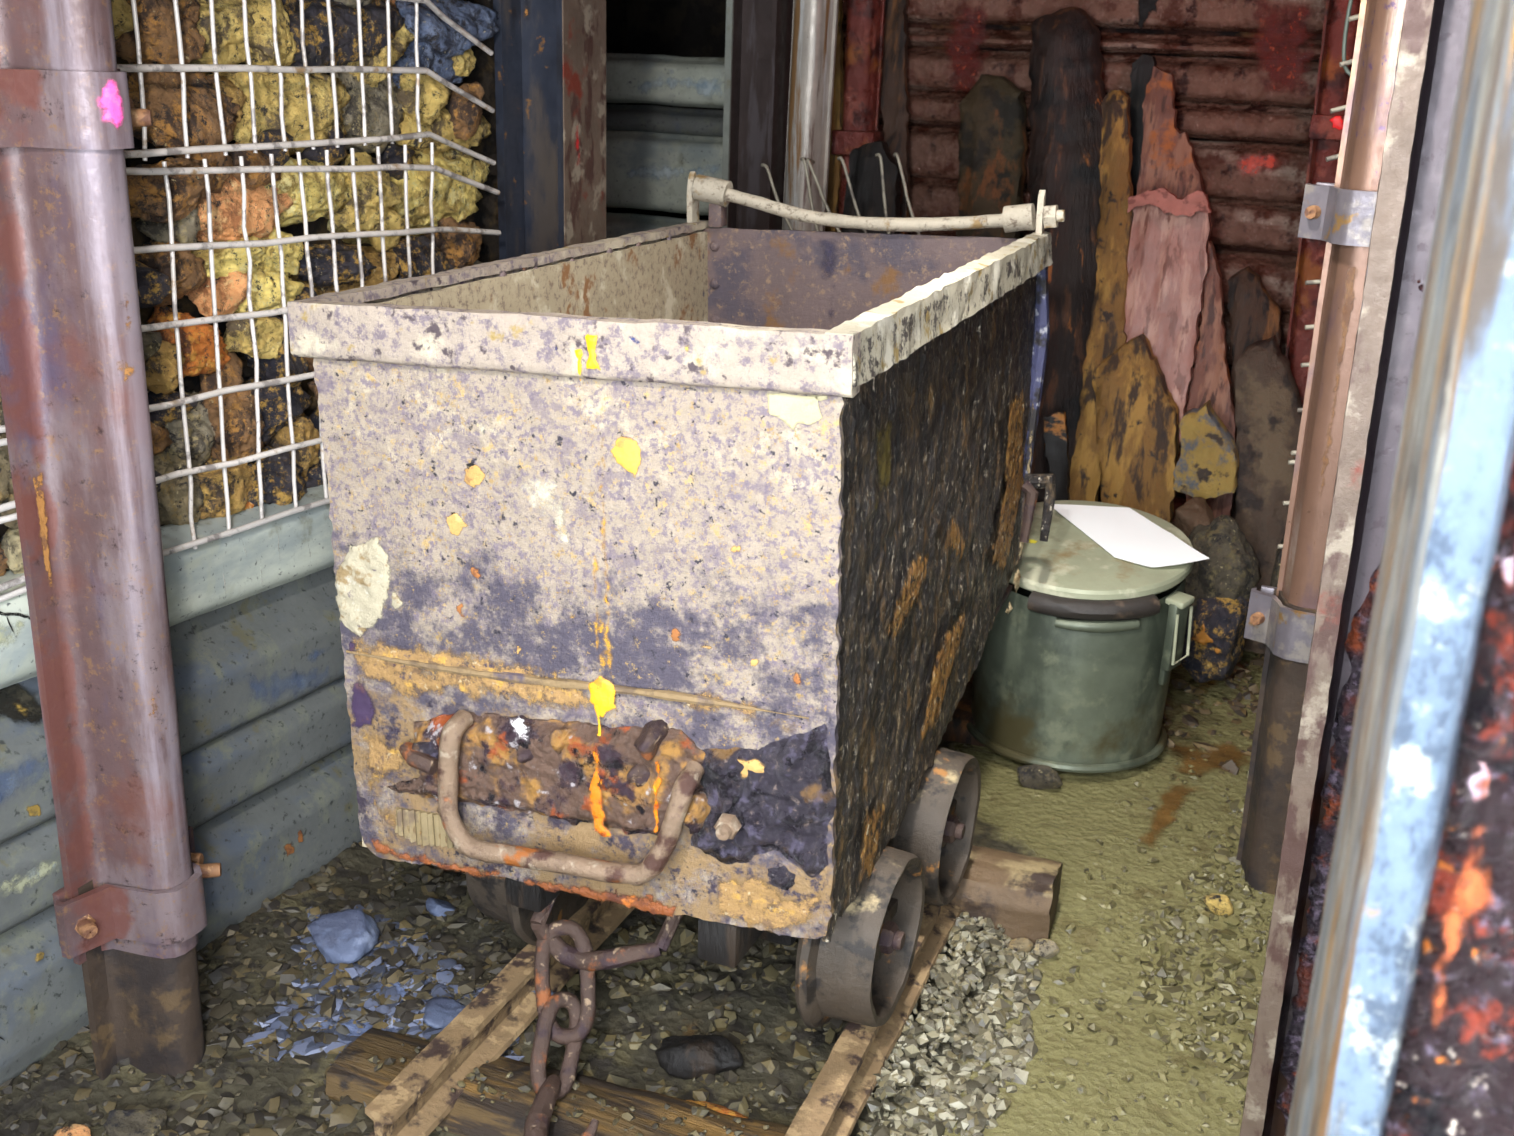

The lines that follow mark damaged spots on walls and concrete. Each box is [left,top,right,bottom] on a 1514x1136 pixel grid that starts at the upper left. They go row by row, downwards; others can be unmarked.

rust [33,473,52,586]